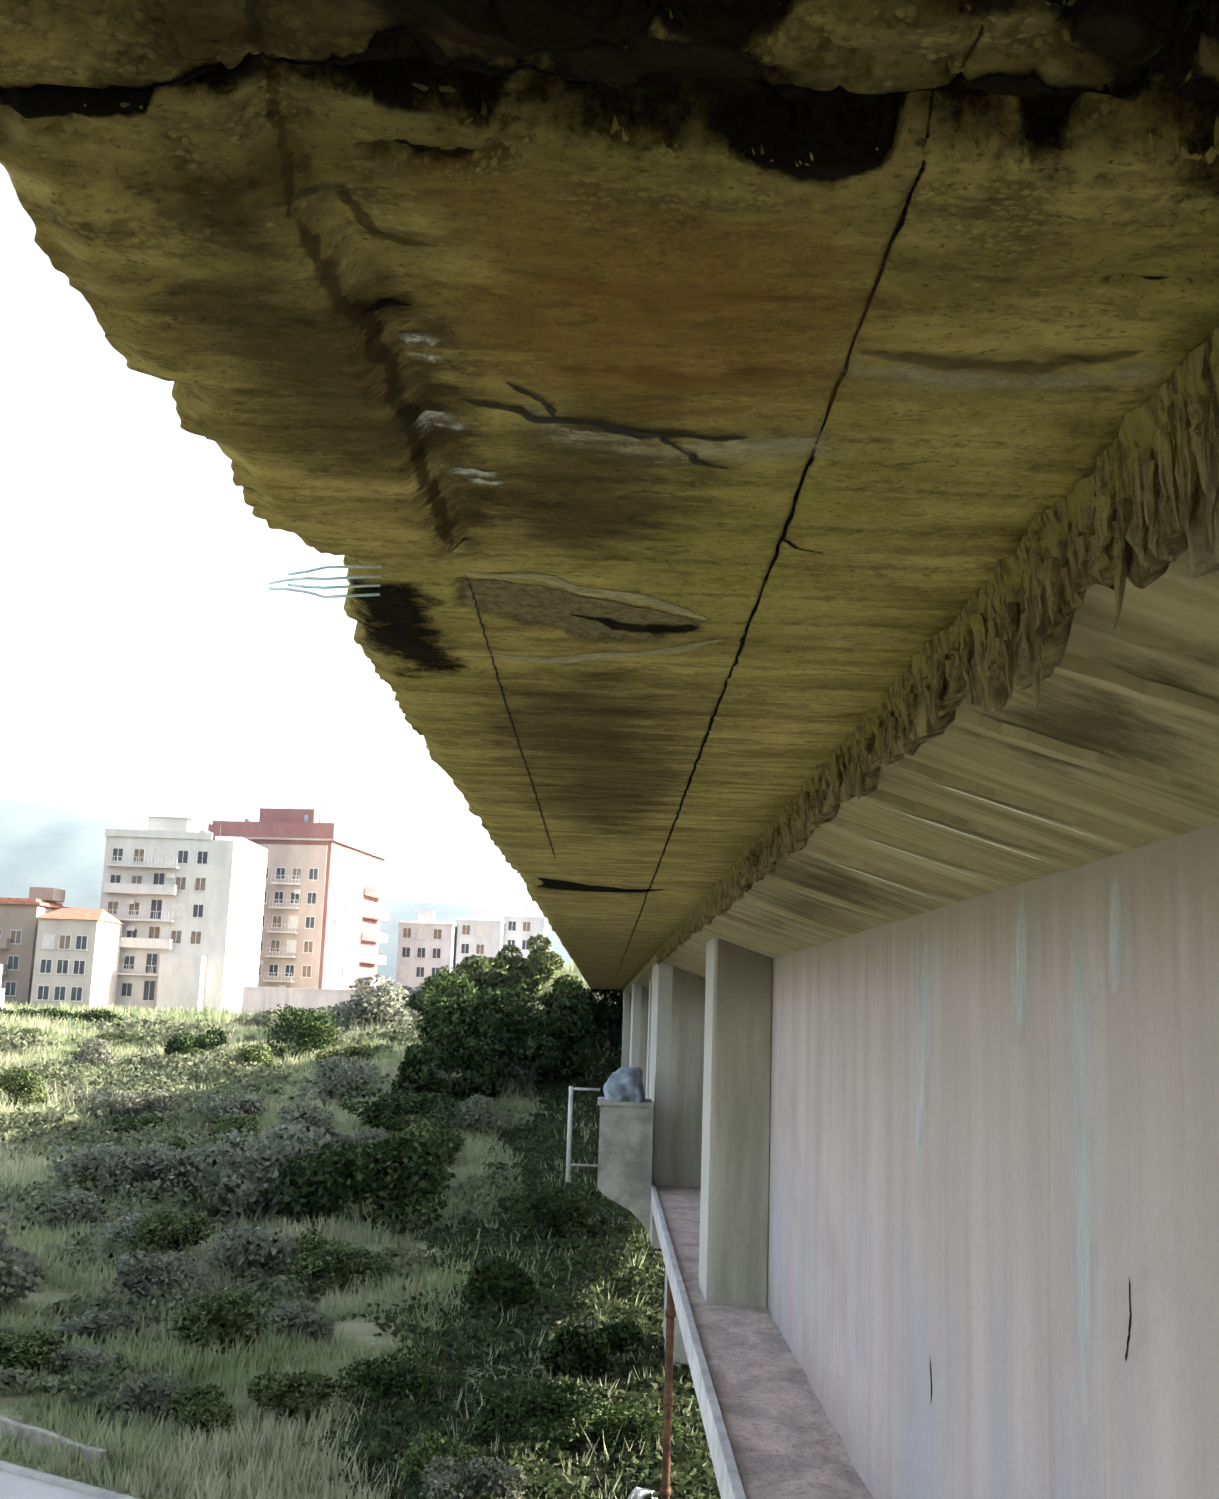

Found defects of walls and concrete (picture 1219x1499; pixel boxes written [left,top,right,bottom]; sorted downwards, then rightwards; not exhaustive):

water stain [370,0,778,88]
water stain [1050,0,1195,101]
crack [0,0,1219,974]
water stain [350,579,465,678]
spalling [455,572,726,663]
spalling [655,325,1219,965]